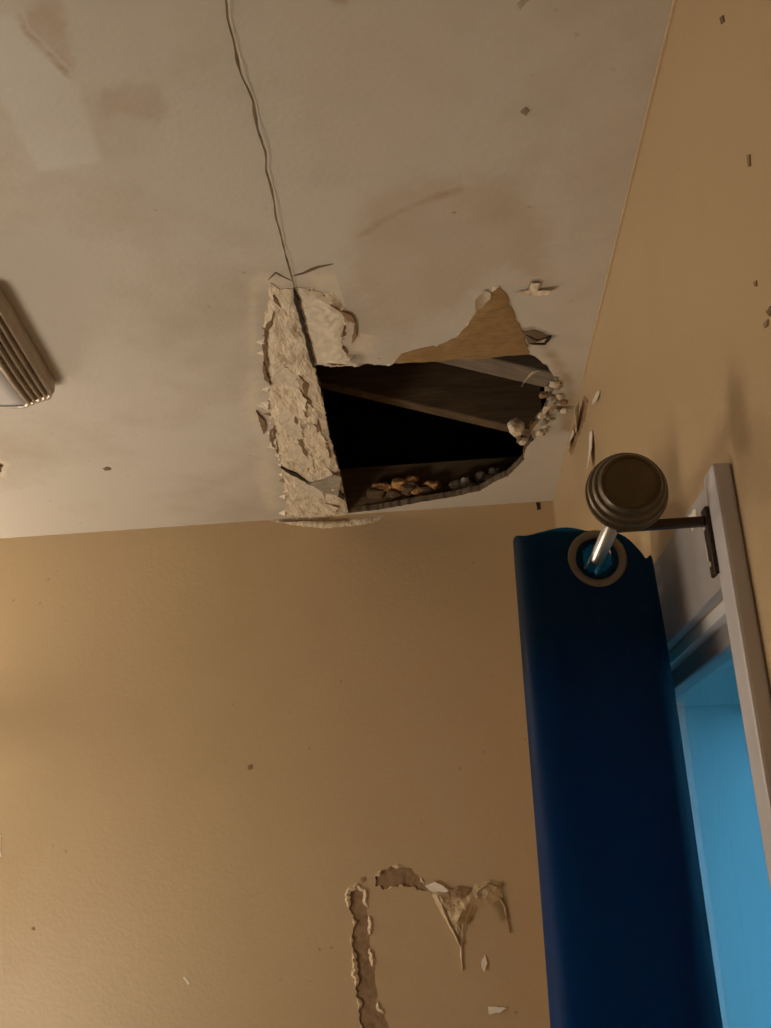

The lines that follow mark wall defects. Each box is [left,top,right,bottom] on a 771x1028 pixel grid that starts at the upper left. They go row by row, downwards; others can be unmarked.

crack [225,0,332,368]
damp [328,162,571,342]
spalling [523,330,551,345]
flaking render [232,265,384,519]
peeling [564,390,600,470]
peeling [425,882,448,893]
peeling [488,1006,507,1015]